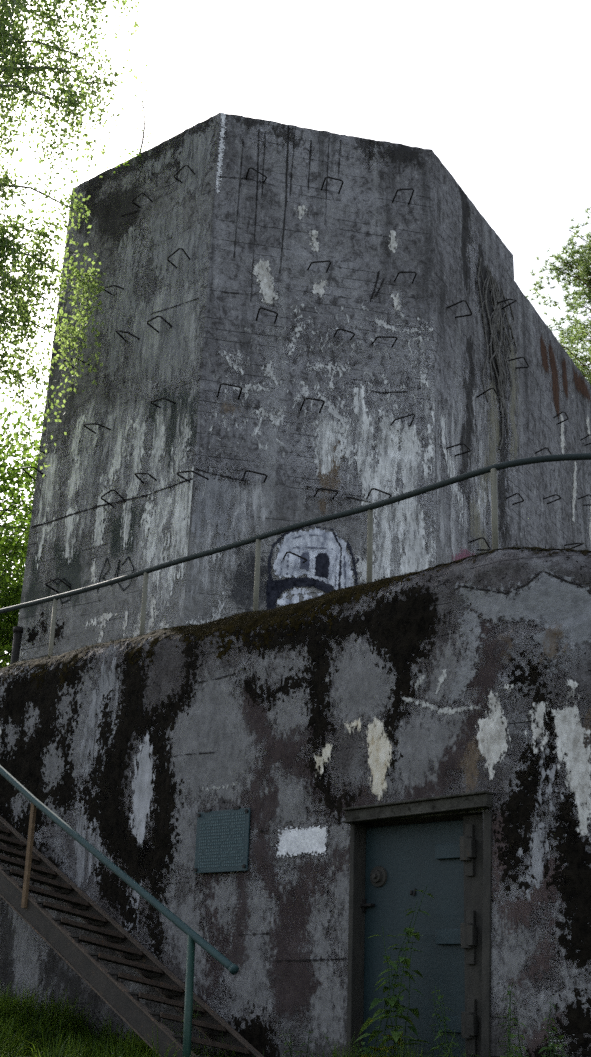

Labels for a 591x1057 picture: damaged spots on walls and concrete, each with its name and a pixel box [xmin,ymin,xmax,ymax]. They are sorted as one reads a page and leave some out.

leakage [354,137,423,172]
leakage [24,112,312,642]
leakage [209,186,520,584]
corrosion [540,337,591,417]
spalling [410,569,591,704]
crack [436,571,591,594]
leakage [70,657,121,890]
leakage [129,733,158,847]
peeling [314,744,332,774]
peeling [344,718,392,800]
peeling [472,682,514,780]
peeling [525,680,591,842]